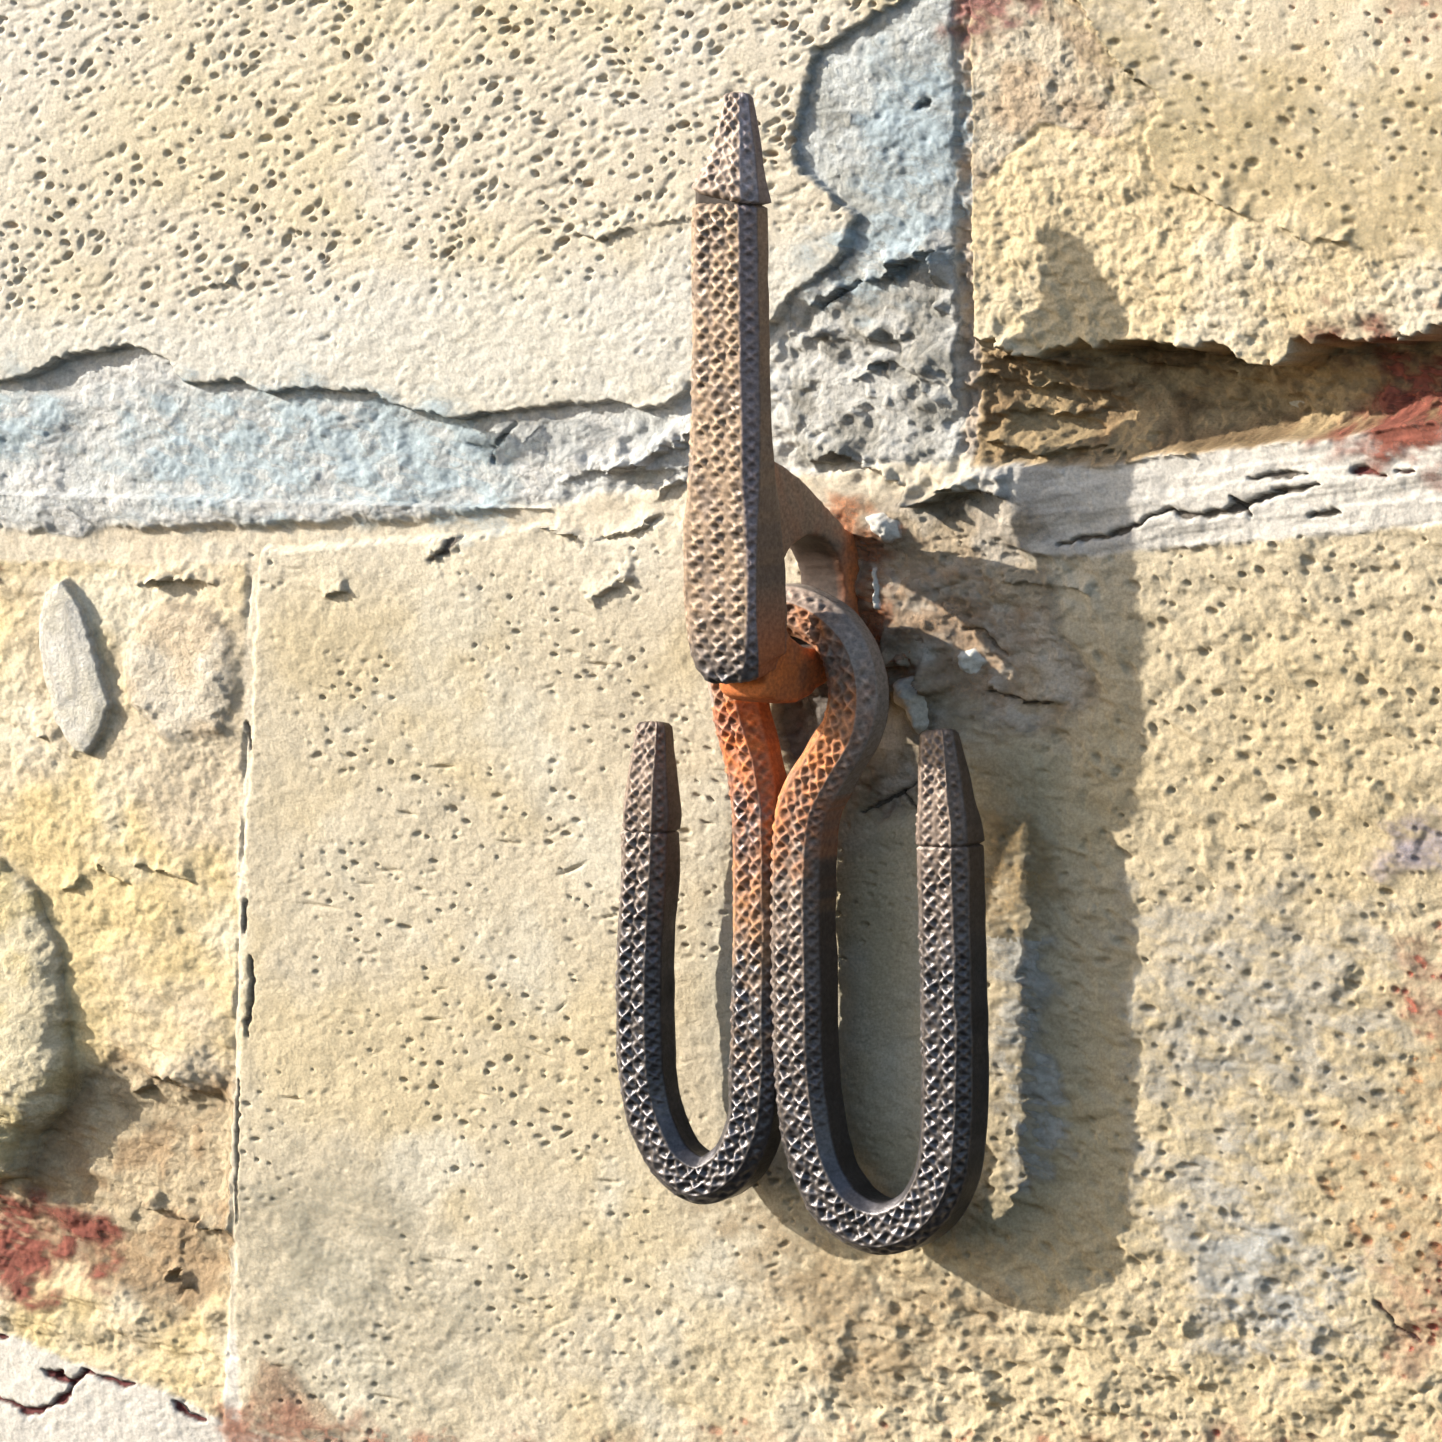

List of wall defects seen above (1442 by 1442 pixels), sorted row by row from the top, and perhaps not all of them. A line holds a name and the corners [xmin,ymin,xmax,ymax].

spalling [787,0,1162,465]
spalling [0,345,692,536]
rust [830,497,885,644]
crack [1061,471,1342,545]
spalling [980,346,1442,461]
crack [1352,466,1415,476]